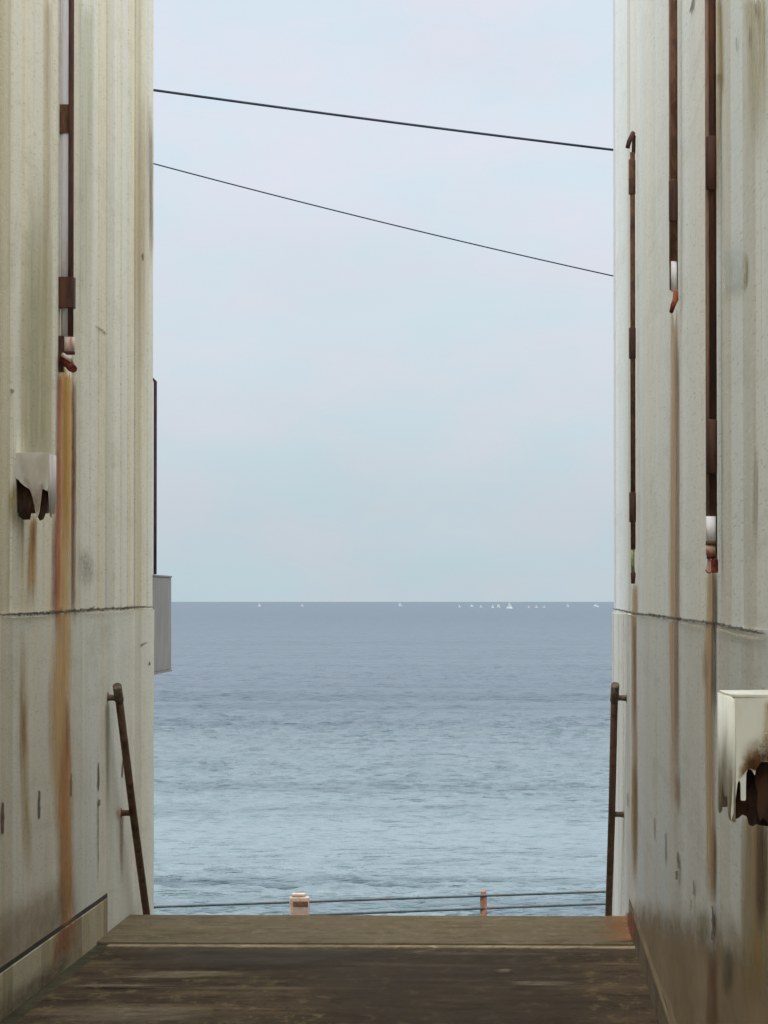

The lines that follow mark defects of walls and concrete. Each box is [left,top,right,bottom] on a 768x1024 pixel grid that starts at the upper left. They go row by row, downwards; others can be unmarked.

rust [54,370,76,955]
rust [669,319,677,738]
rust [705,572,715,888]
rust [741,733,768,776]